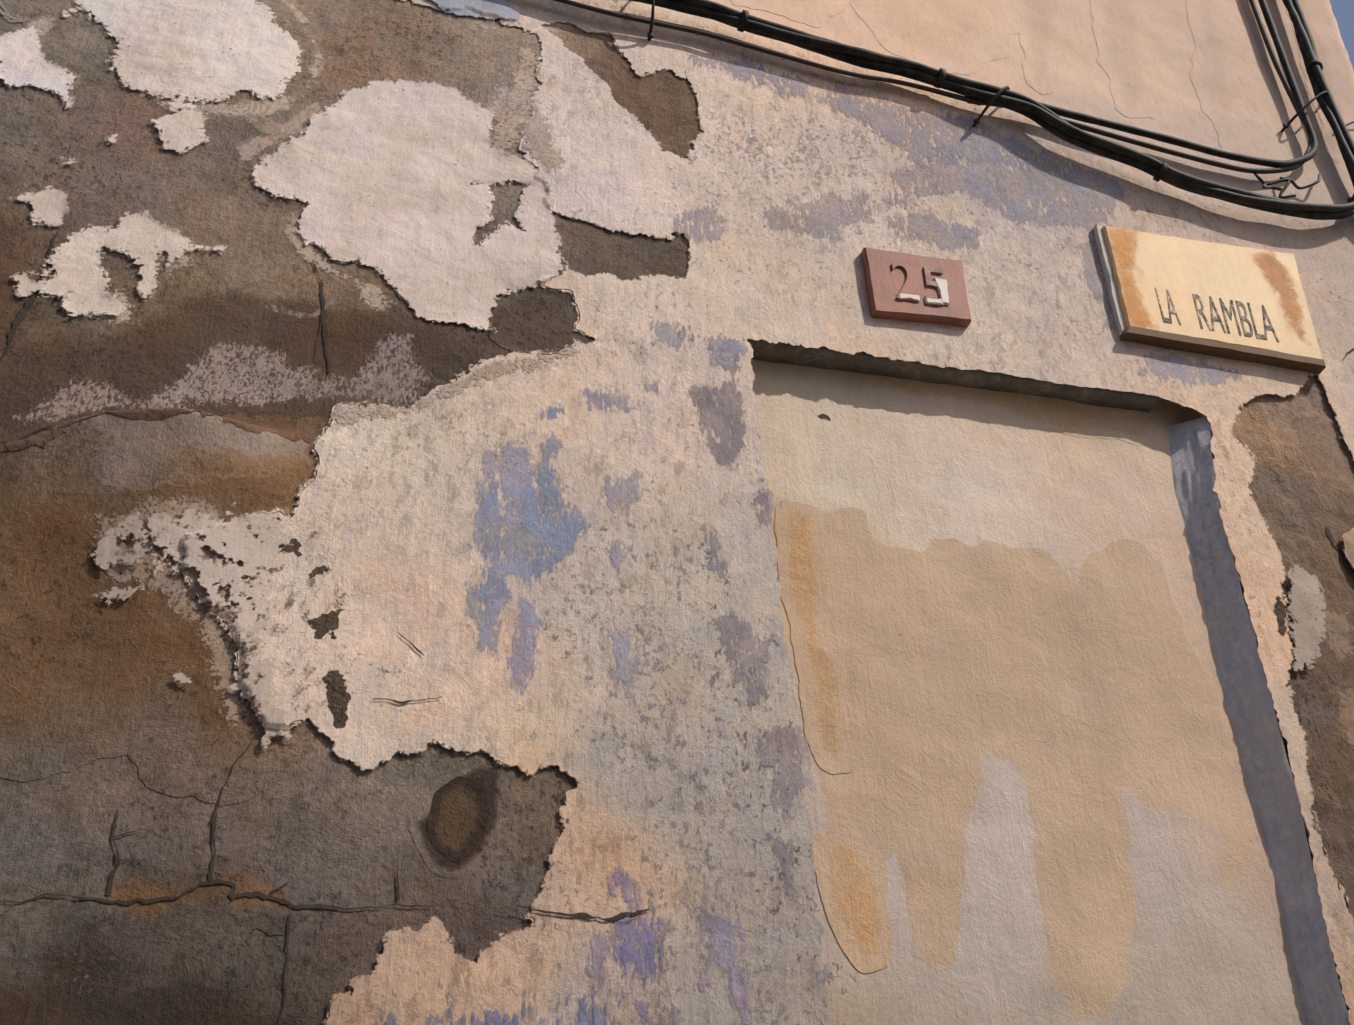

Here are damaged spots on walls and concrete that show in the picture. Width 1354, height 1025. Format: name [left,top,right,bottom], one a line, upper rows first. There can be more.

crack [0,226,61,363]
flaking render [0,0,1131,470]
water stain [0,182,589,734]
water stain [0,894,339,1025]
crack [0,742,434,1025]
water stain [408,758,507,879]
crack [516,905,649,923]
water stain [802,503,1258,1025]
flaking render [1231,375,1354,919]